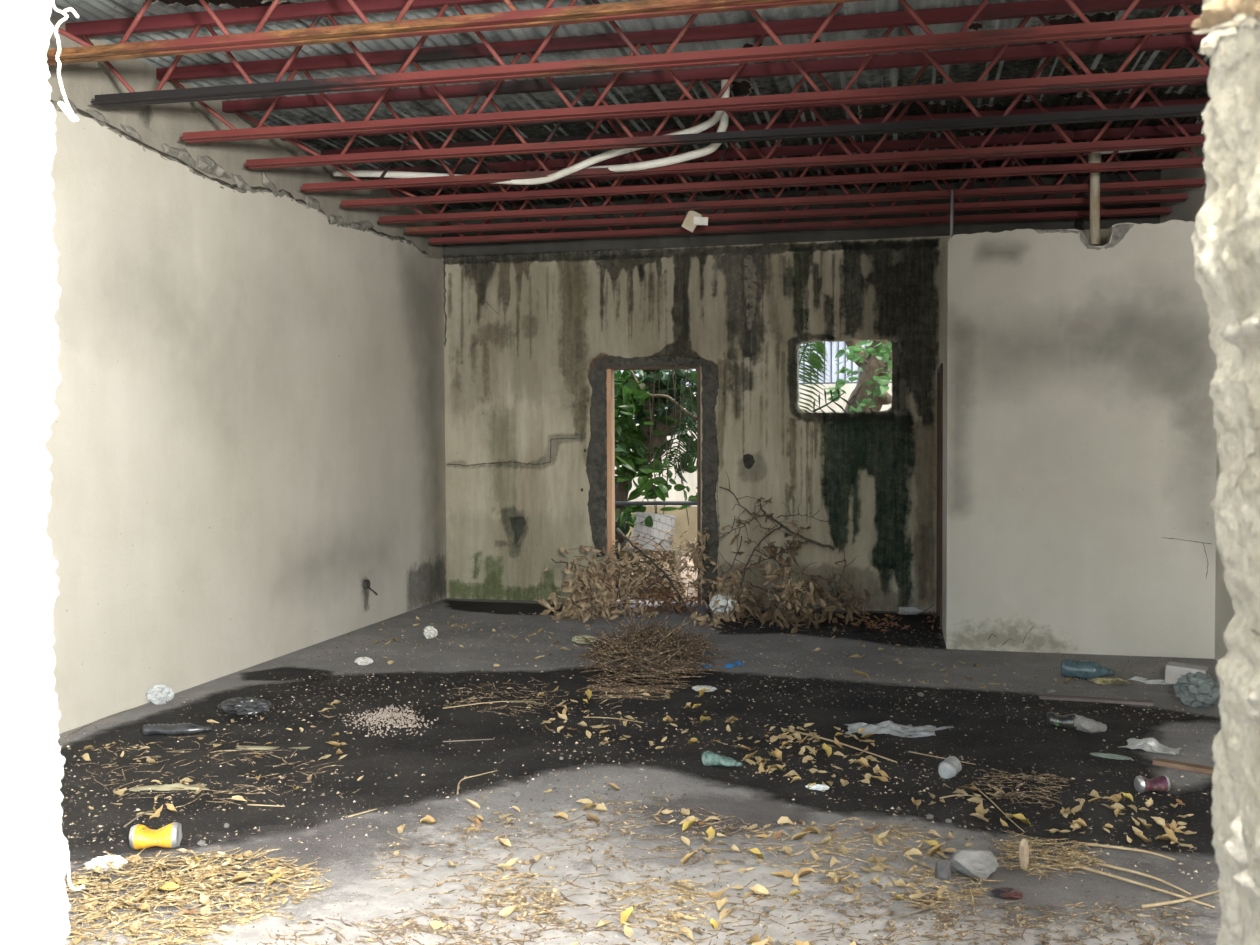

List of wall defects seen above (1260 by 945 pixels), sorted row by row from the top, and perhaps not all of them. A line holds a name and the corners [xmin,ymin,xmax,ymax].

peeling [50,96,430,259]
damp [460,260,533,317]
damp [558,249,767,427]
damp [788,242,939,513]
crack [447,437,585,466]
damp [851,470,861,542]
damp [474,553,502,588]